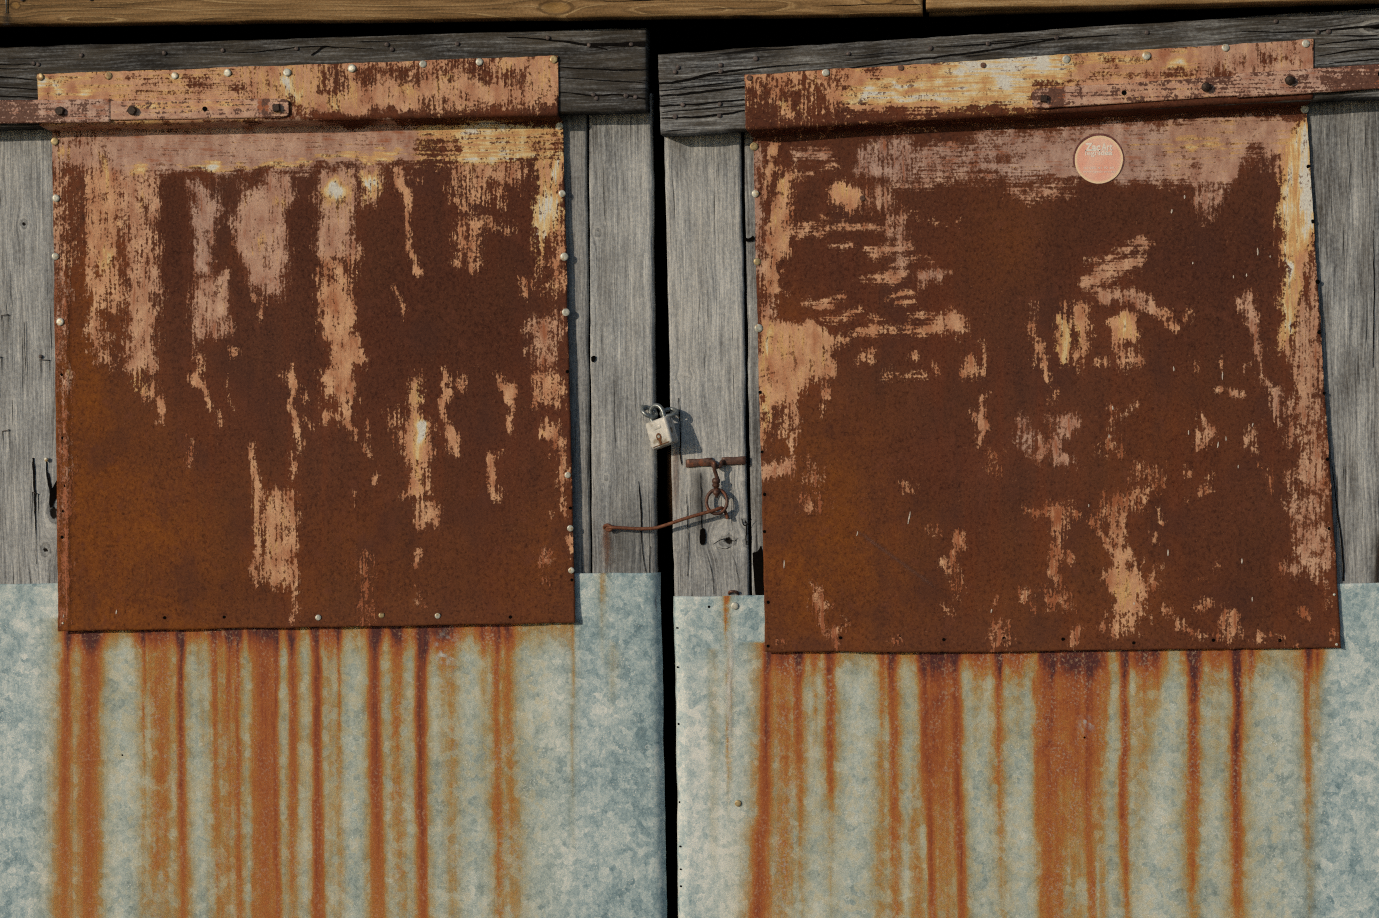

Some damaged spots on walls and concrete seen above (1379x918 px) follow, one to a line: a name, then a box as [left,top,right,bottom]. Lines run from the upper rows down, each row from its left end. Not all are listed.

corrosion [37,55,575,918]
corrosion [742,40,1341,918]